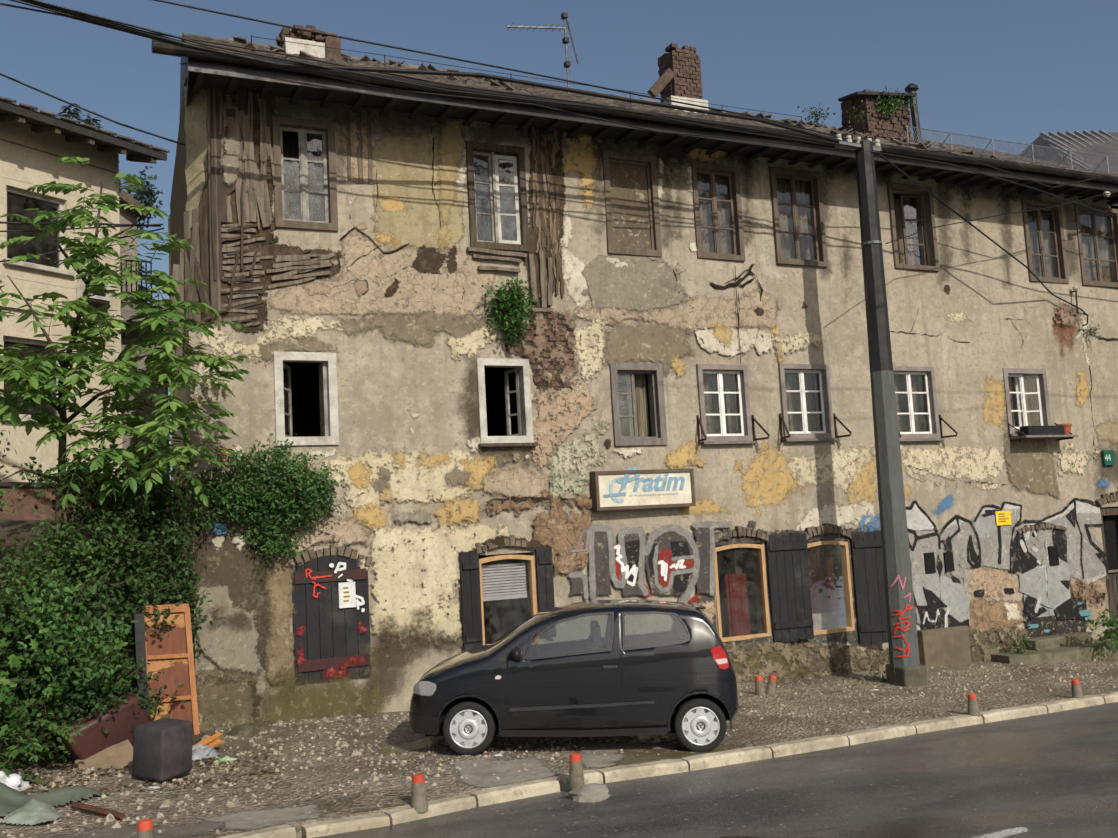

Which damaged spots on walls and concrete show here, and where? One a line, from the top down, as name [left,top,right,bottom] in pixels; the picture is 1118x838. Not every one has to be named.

crack [340,216,409,297]
crack [647,256,763,322]
corrosion [1053,323,1078,356]
flaking render [194,118,825,729]
peeling [982,375,1006,432]
damp [194,518,271,666]
flaking render [677,438,890,682]